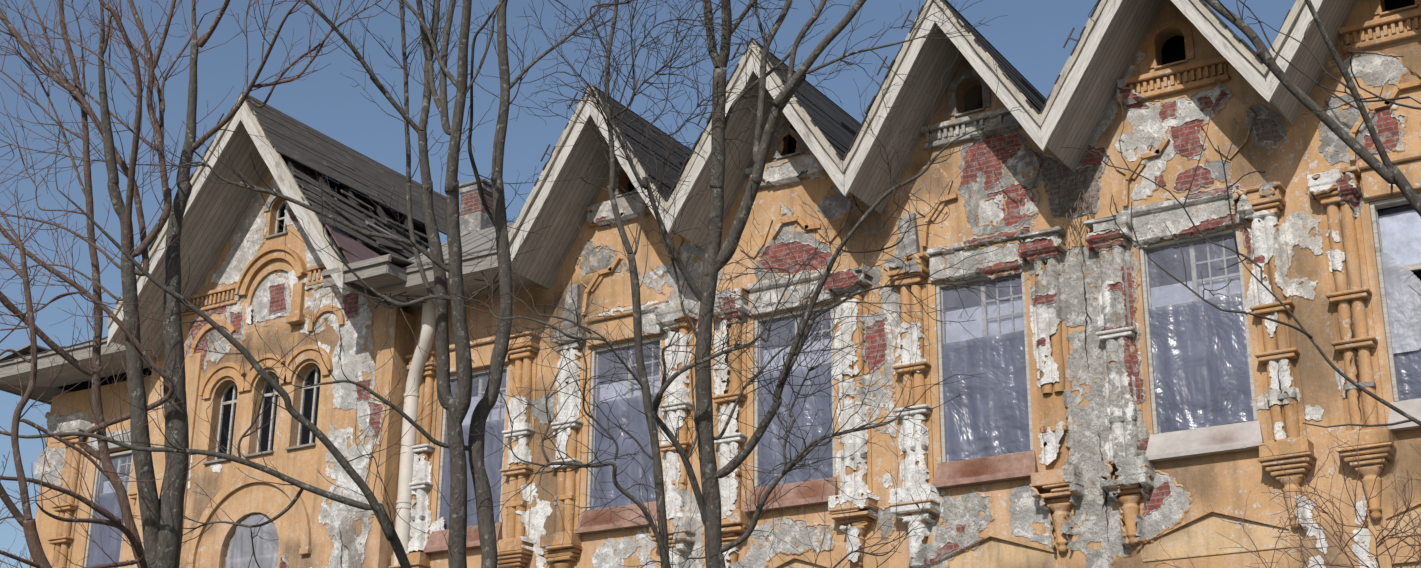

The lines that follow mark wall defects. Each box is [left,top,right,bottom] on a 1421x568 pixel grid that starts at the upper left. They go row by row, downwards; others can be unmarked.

flaking render [186,177,385,568]
flaking render [575,46,1421,568]
crack [1081,260,1092,373]
peeling [515,483,558,568]
crack [1097,428,1109,542]